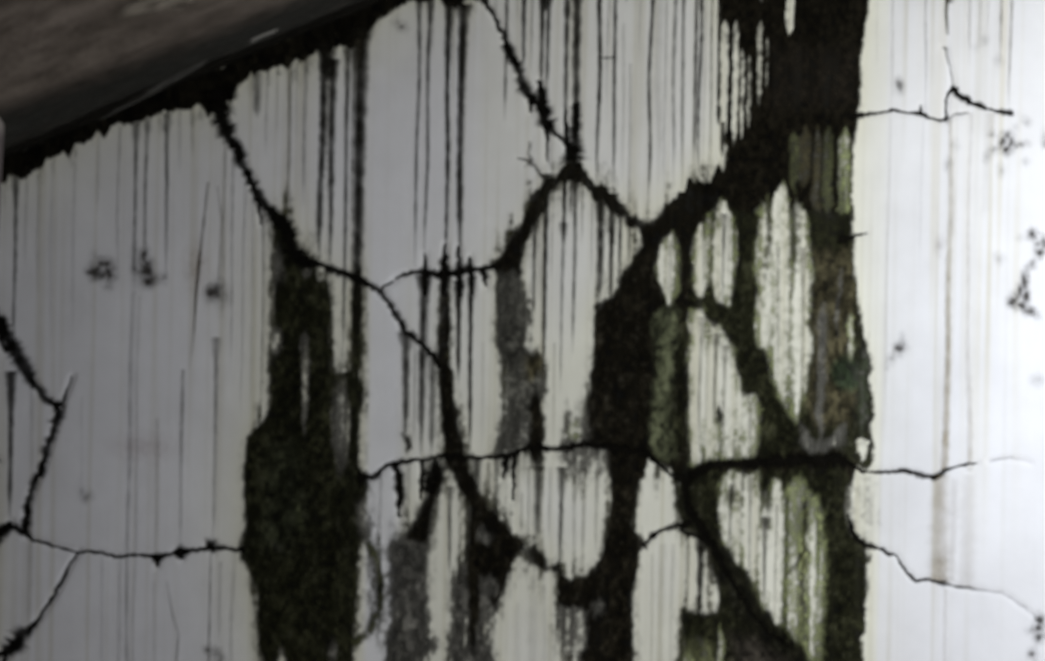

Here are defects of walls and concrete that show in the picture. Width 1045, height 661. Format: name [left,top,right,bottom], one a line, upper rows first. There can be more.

water stain [0,0,433,276]
crack [481,0,584,178]
crack [840,66,1014,122]
water stain [88,261,113,279]
water stain [134,251,155,285]
crack [202,87,497,369]
water stain [239,0,875,661]
crack [838,233,868,243]
water stain [1009,276,1033,313]
water stain [7,371,16,498]
crack [0,316,245,661]
crack [357,440,977,648]